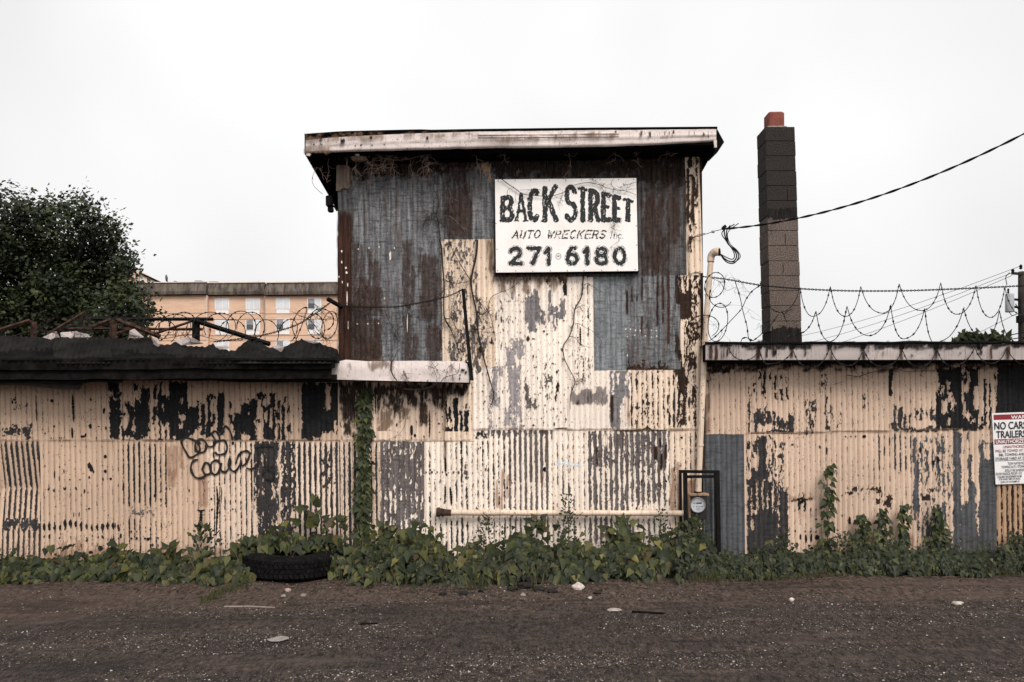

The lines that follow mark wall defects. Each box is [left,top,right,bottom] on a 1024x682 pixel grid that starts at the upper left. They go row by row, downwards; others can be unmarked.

corrosion [337,211,383,361]
corrosion [402,241,442,361]
corrosion [445,162,472,239]
corrosion [626,174,718,431]
peeling [1,380,360,559]
peeling [370,239,735,554]
corrosion [556,395,647,431]
peeling [738,363,1024,562]